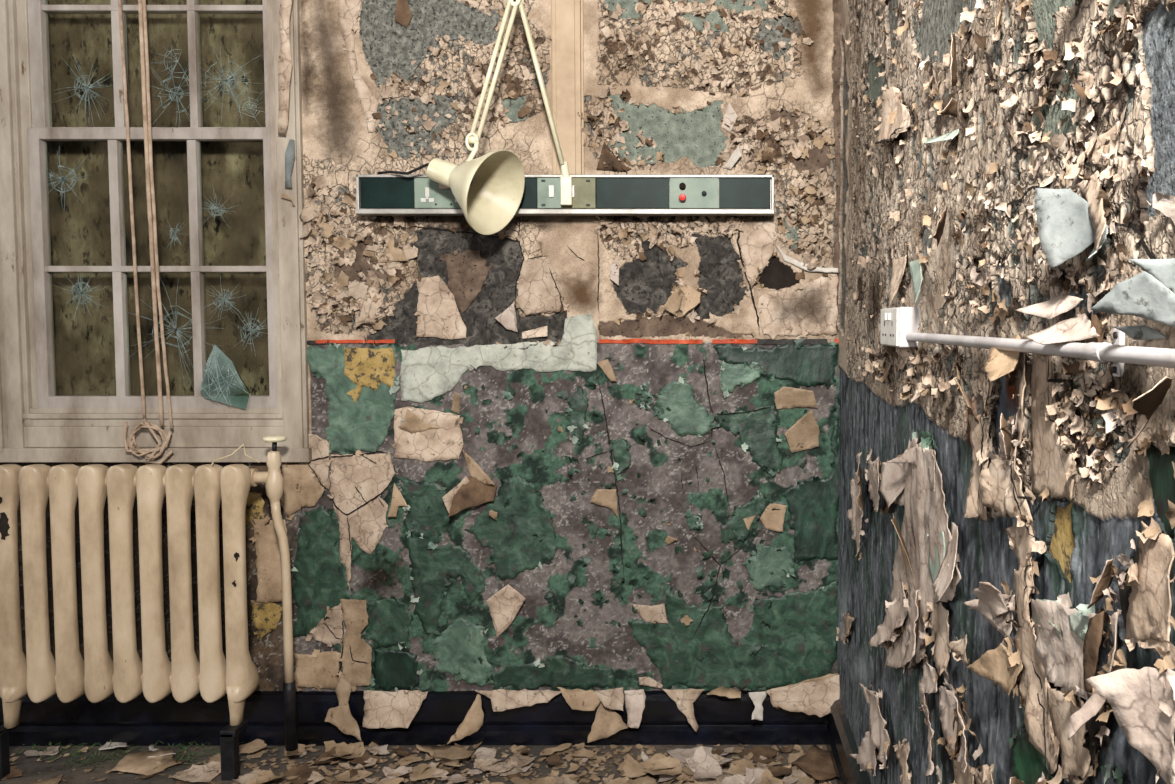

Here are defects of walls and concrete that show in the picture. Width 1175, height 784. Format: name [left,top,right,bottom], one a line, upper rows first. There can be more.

peeling [249,434,428,741]
peeling [278,0,1175,784]